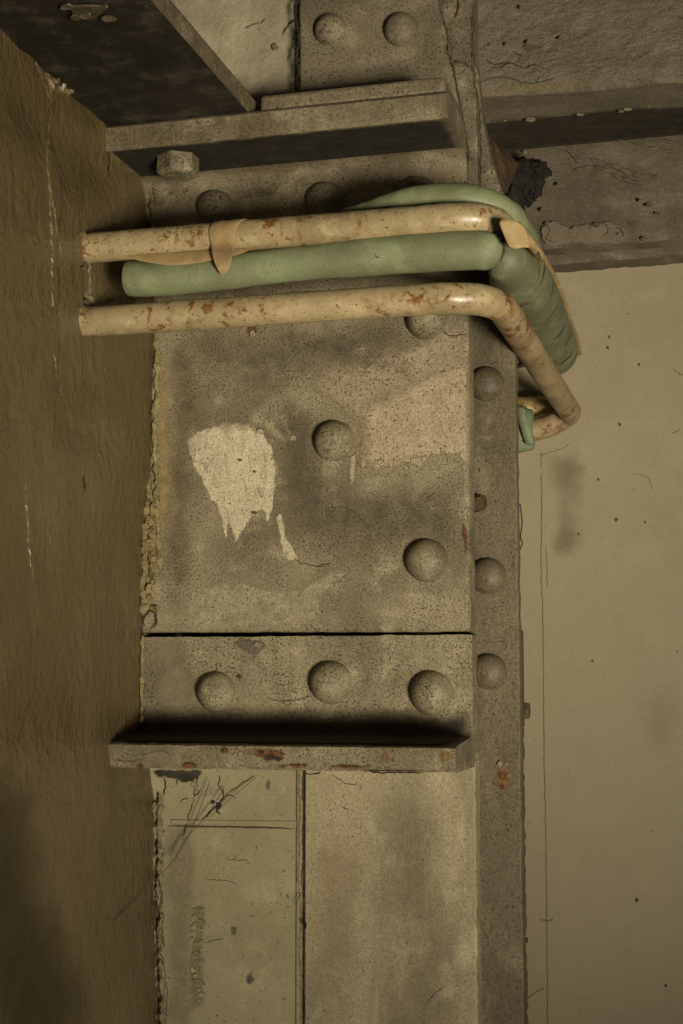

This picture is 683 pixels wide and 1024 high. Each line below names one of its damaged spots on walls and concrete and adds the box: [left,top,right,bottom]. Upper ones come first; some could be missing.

peeling [60,3,117,22]
spalling [139,333,163,616]
peeling [187,414,298,561]
damp [154,770,201,795]
rust [254,750,308,768]
spalling [152,794,168,1024]
crack [177,771,357,1024]